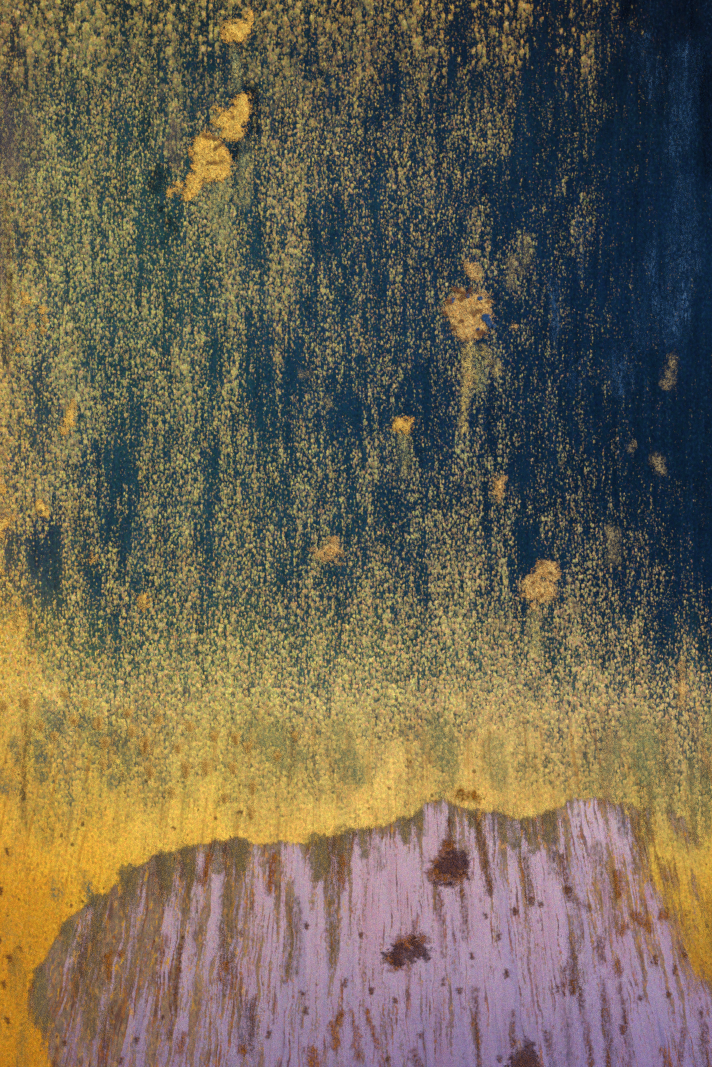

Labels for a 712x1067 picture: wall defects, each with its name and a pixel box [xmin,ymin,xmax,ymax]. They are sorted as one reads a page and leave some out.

rust [425,817,493,933]
peeling [28,797,712,1067]
rust [382,922,433,972]
rust [442,979,480,1060]
rust [497,1013,550,1067]